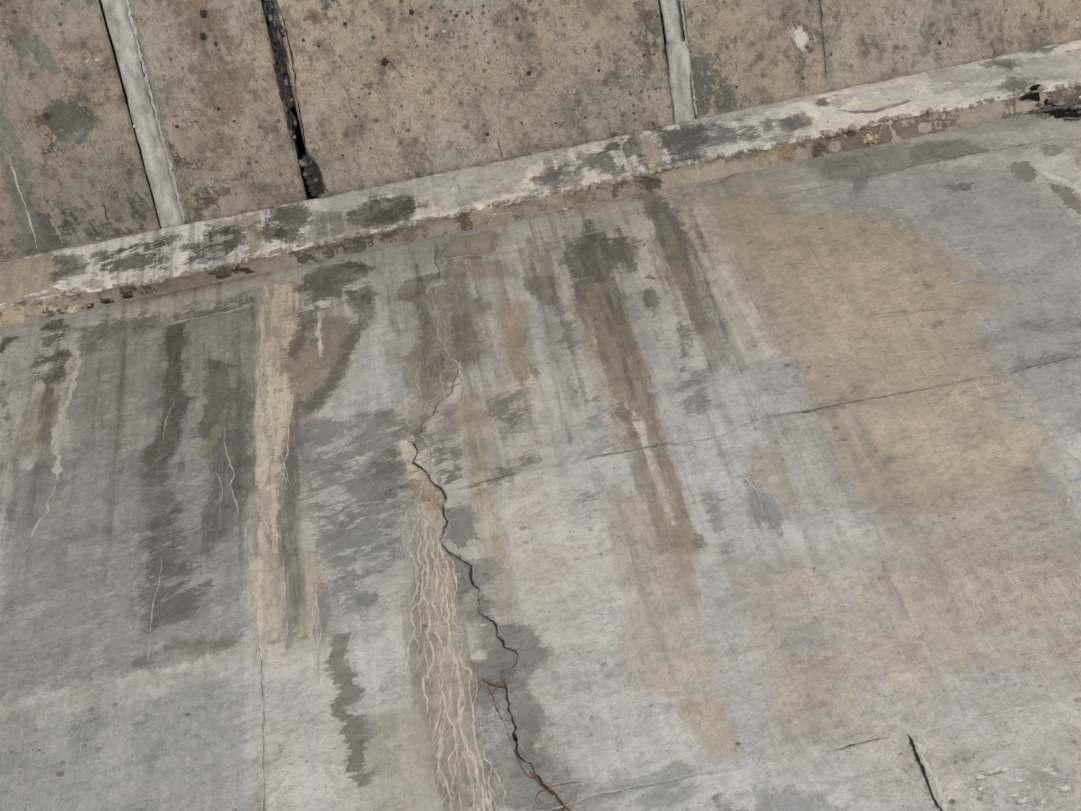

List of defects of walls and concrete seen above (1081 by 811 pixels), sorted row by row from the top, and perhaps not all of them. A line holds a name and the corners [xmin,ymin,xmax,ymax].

water stain [0,91,696,811]
crack [407,245,565,811]
water stain [502,53,1081,551]
crack [908,734,943,811]
spalling [1020,84,1081,120]